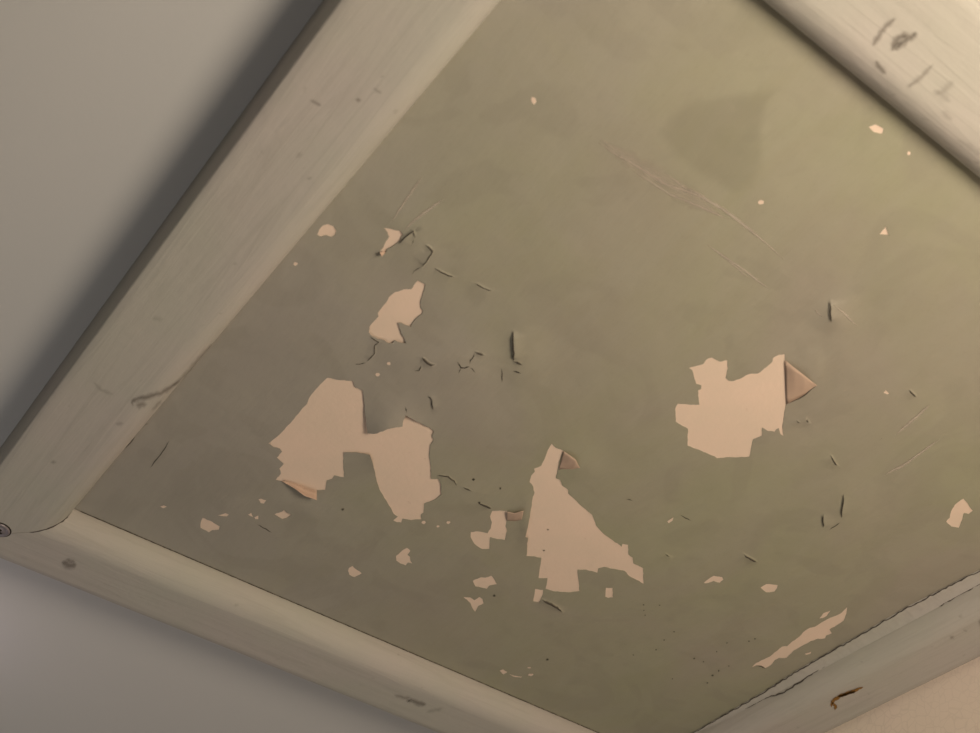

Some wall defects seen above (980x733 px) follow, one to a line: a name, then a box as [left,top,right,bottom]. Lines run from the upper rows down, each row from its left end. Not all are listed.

peeling [380,228,403,256]
crack [400,231,452,277]
peeling [369,281,425,343]
crack [458,334,521,378]
peeling [675,354,817,458]
peeling [269,378,450,527]
peeling [471,444,644,602]
peeling [946,499,973,528]
peeling [753,608,847,668]
corrosion [831,687,863,709]